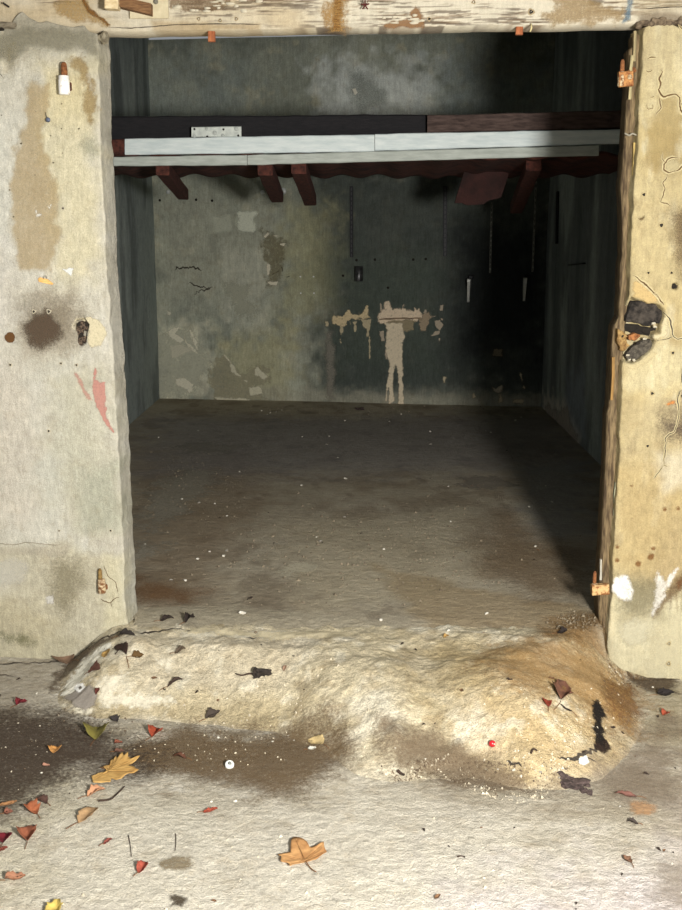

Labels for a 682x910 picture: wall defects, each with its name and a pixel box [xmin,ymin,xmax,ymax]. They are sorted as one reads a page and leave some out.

rust [321,0,346,32]
crack [646,55,682,116]
crack [660,153,682,207]
leakage [25,308,63,349]
spalling [614,281,668,369]
crack [633,275,682,342]
crack [653,368,682,479]
leakage [0,706,355,822]